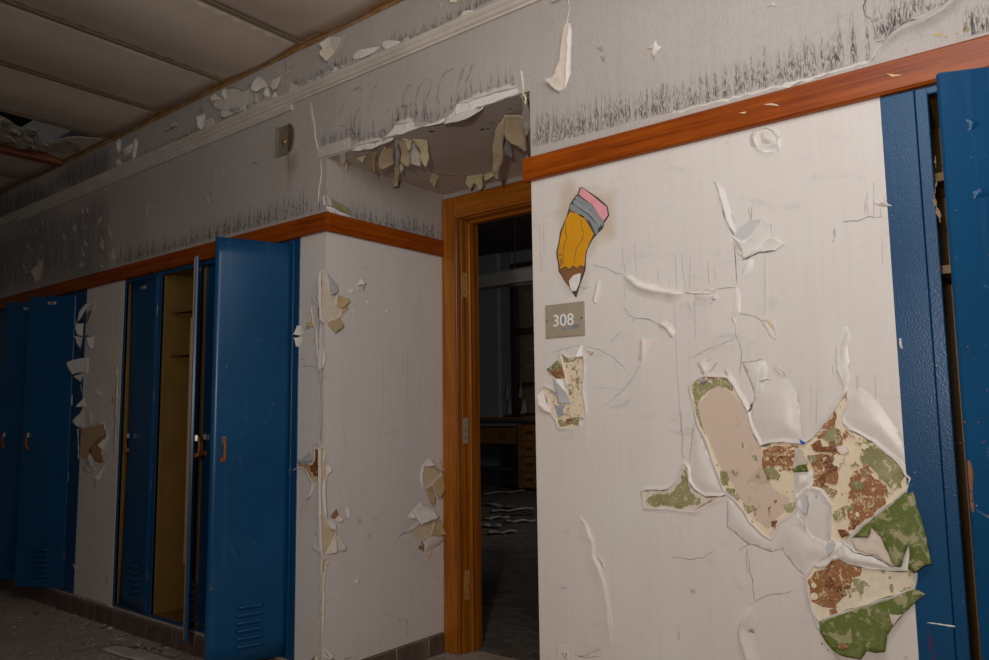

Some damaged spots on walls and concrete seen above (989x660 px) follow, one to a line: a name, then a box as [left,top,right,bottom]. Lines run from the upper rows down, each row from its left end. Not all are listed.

crack [863,0,973,64]
peeling [196,33,409,130]
water stain [528,34,856,138]
peeling [340,84,530,193]
peeling [749,124,783,159]
crack [714,181,752,235]
peeling [293,259,350,397]
peeling [536,338,659,433]
crack [610,308,677,343]
crack [695,339,733,376]
peeling [592,264,911,544]
peeling [801,556,917,631]